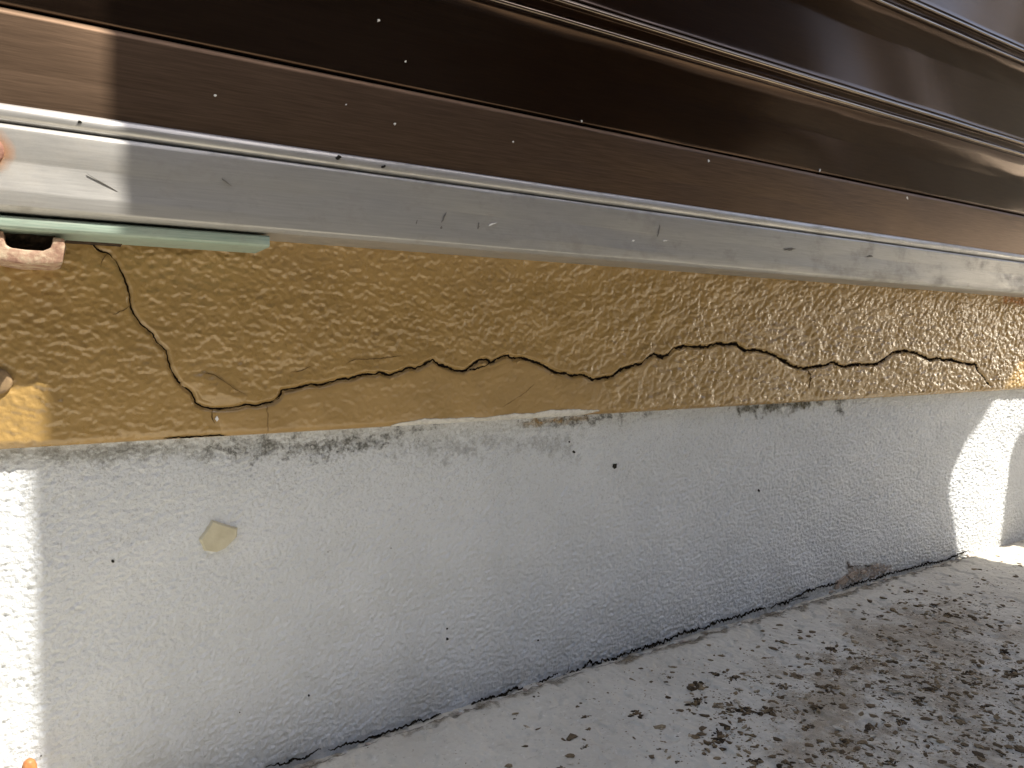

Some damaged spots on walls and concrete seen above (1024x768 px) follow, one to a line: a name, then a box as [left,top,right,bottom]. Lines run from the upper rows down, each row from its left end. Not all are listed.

water stain [256,426,399,459]
crack [92,245,990,439]
water stain [737,400,843,417]
crack [266,551,971,768]